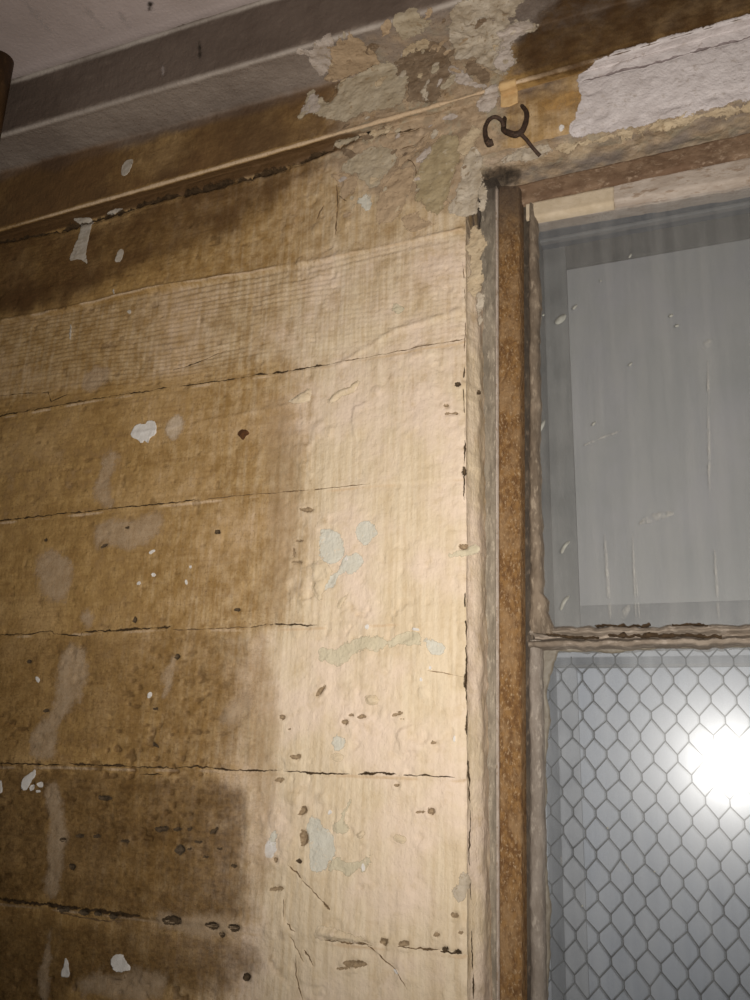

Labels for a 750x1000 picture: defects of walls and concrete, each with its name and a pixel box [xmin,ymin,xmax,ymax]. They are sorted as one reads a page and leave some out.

peeling [296,0,539,218]
peeling [501,14,750,163]
water stain [484,166,520,188]
peeling [69,217,94,263]
water stain [0,186,250,311]
crack [0,269,466,417]
peeling [131,420,157,443]
water stain [165,415,183,439]
crack [432,593,468,735]
water stain [40,783,70,894]
crack [0,761,471,896]
crack [283,899,474,999]